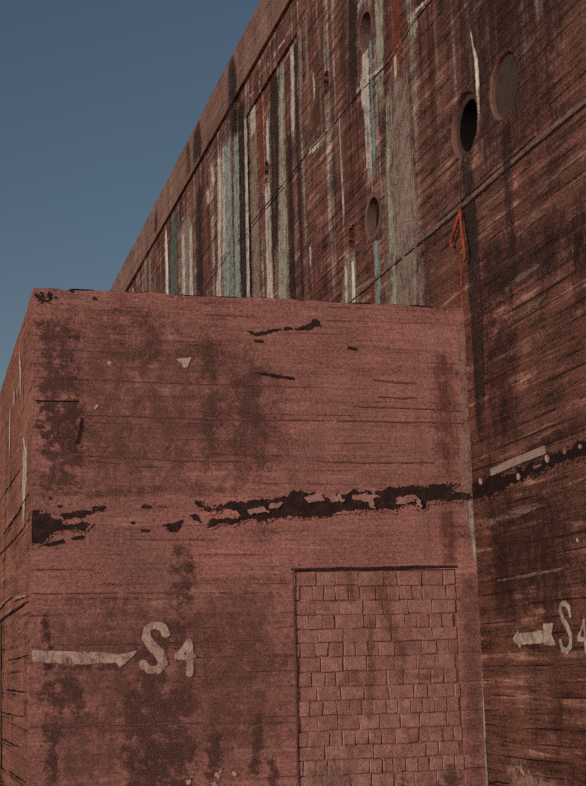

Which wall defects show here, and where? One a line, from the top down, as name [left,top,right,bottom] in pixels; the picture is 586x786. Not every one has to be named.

leakage [33,322,83,497]
spalling [161,319,586,560]
spalling [31,496,106,547]
leakage [39,614,52,651]
leakage [39,662,117,786]
leakage [121,545,196,786]
leakage [205,733,222,786]
leakage [248,713,279,786]